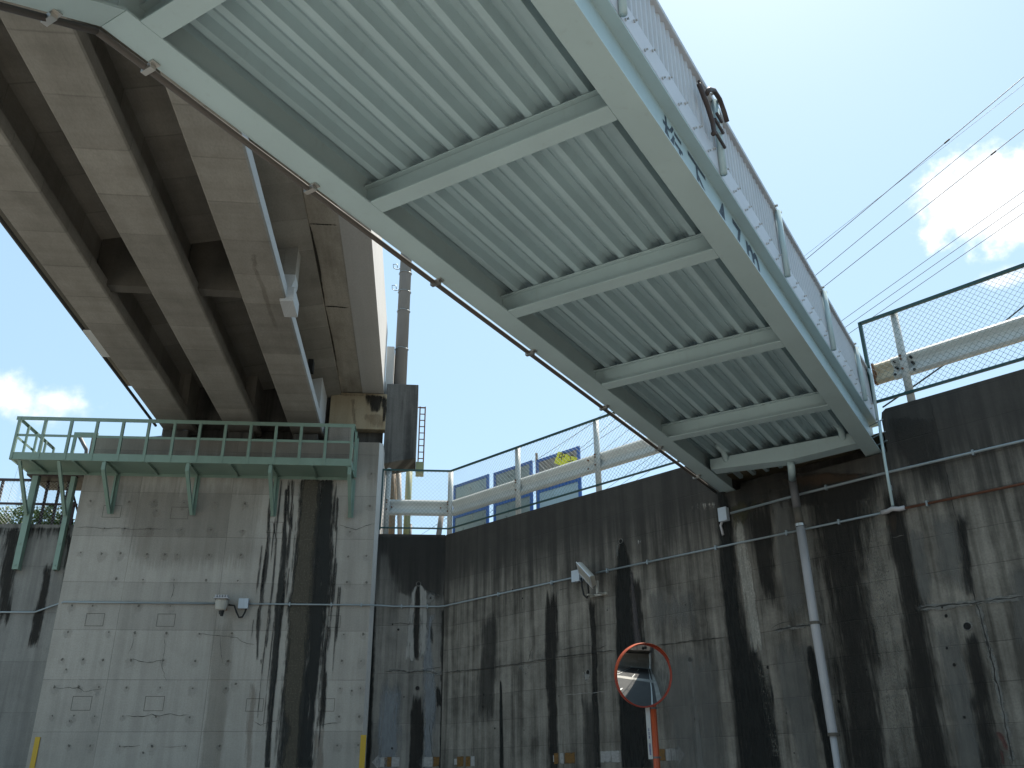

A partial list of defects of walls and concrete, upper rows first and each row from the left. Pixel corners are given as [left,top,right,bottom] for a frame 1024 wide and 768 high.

leakage [366,395,387,421]
leakage [893,417,941,486]
leakage [0,527,72,646]
leakage [252,480,341,768]
leakage [366,536,444,768]
leakage [479,617,503,768]
leakage [545,592,558,768]
leakage [619,693,653,768]
leakage [615,542,694,660]
leakage [664,473,1002,768]
crack [916,399,1021,764]